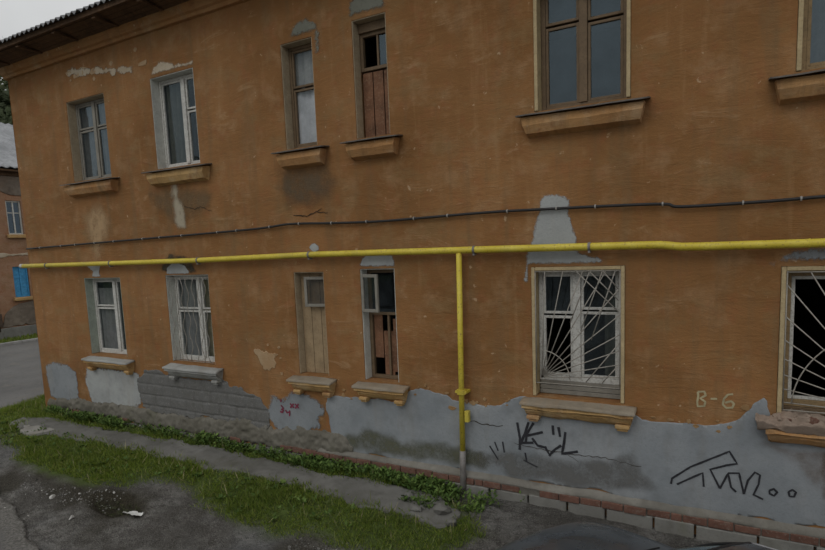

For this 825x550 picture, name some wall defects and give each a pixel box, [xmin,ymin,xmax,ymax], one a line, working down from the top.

peeling [66,60,147,81]
peeling [254,344,283,375]
flaking render [47,370,353,453]